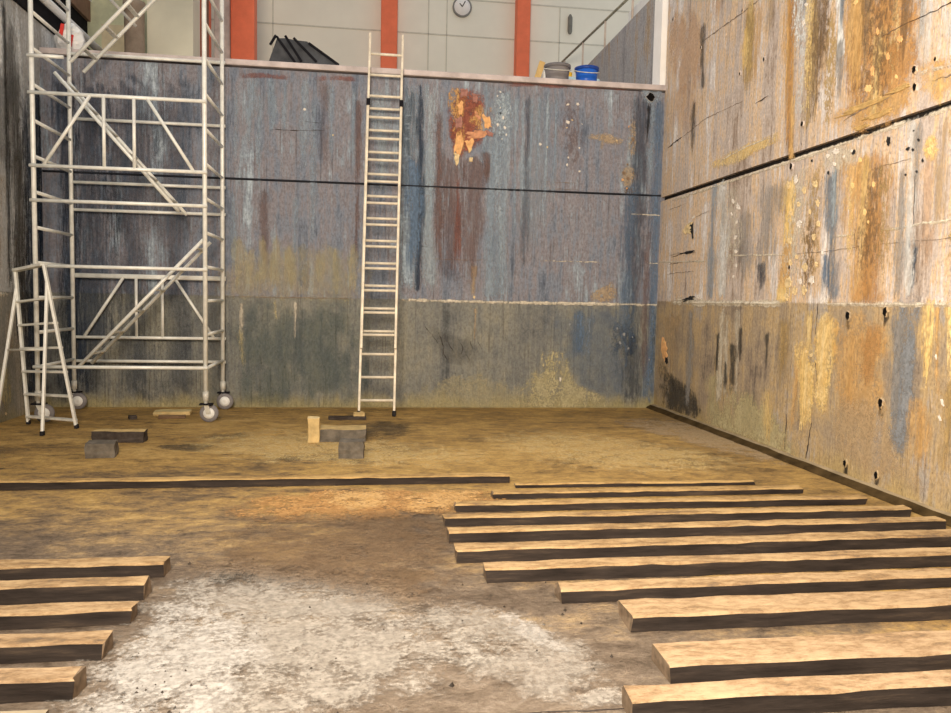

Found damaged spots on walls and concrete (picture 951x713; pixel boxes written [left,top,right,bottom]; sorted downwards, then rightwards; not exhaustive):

rust [714,0,951,166]
leakage [0,0,87,415]
leakage [225,296,349,344]
rust [435,115,464,265]
leakage [396,85,951,461]
rust [778,312,839,431]
rust [841,152,892,303]
rust [924,120,951,252]